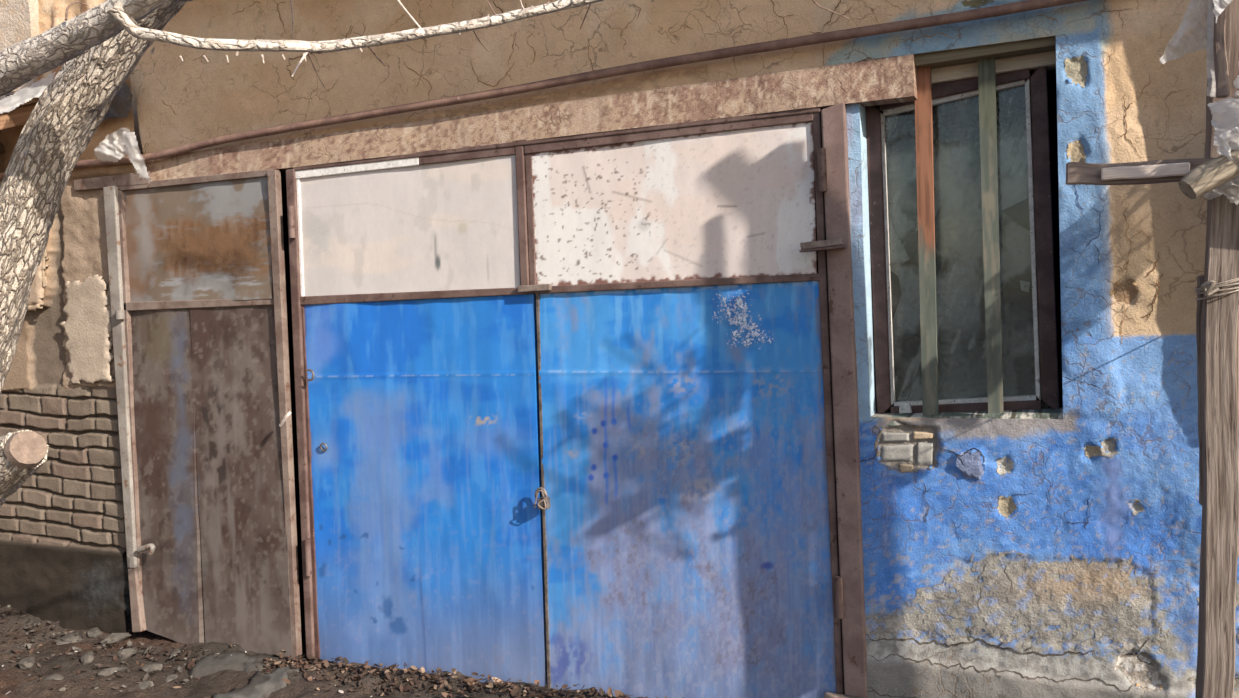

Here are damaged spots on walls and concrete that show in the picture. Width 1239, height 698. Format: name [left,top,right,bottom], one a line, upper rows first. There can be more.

crack [232,1,432,96]
crack [471,0,561,87]
crack [771,0,964,64]
peeling [713,288,773,350]
spalling [874,422,937,473]
crack [940,448,985,469]
peeling [956,450,1014,480]
peeling [1084,438,1119,461]
crack [920,480,961,542]
peeling [997,495,1017,518]
crack [1011,482,1095,536]
peeling [865,549,1163,693]